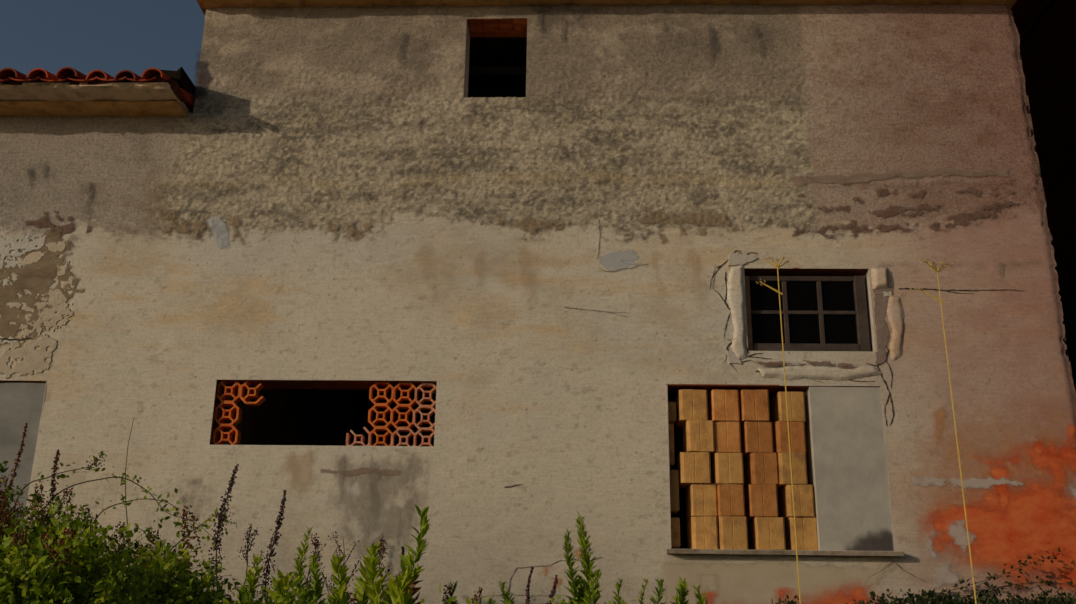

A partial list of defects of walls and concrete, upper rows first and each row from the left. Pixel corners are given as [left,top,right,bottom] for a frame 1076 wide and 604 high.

peeling [792,187,1018,239]
spalling [1028,158,1051,248]
peeling [0,210,91,379]
crack [710,250,770,372]
crack [898,287,1023,295]
crack [813,346,894,426]
leakage [320,467,400,477]
peeling [911,477,1023,489]
rust [930,425,1076,588]
peeling [948,520,975,550]
crack [477,557,602,599]
rust [796,587,871,604]